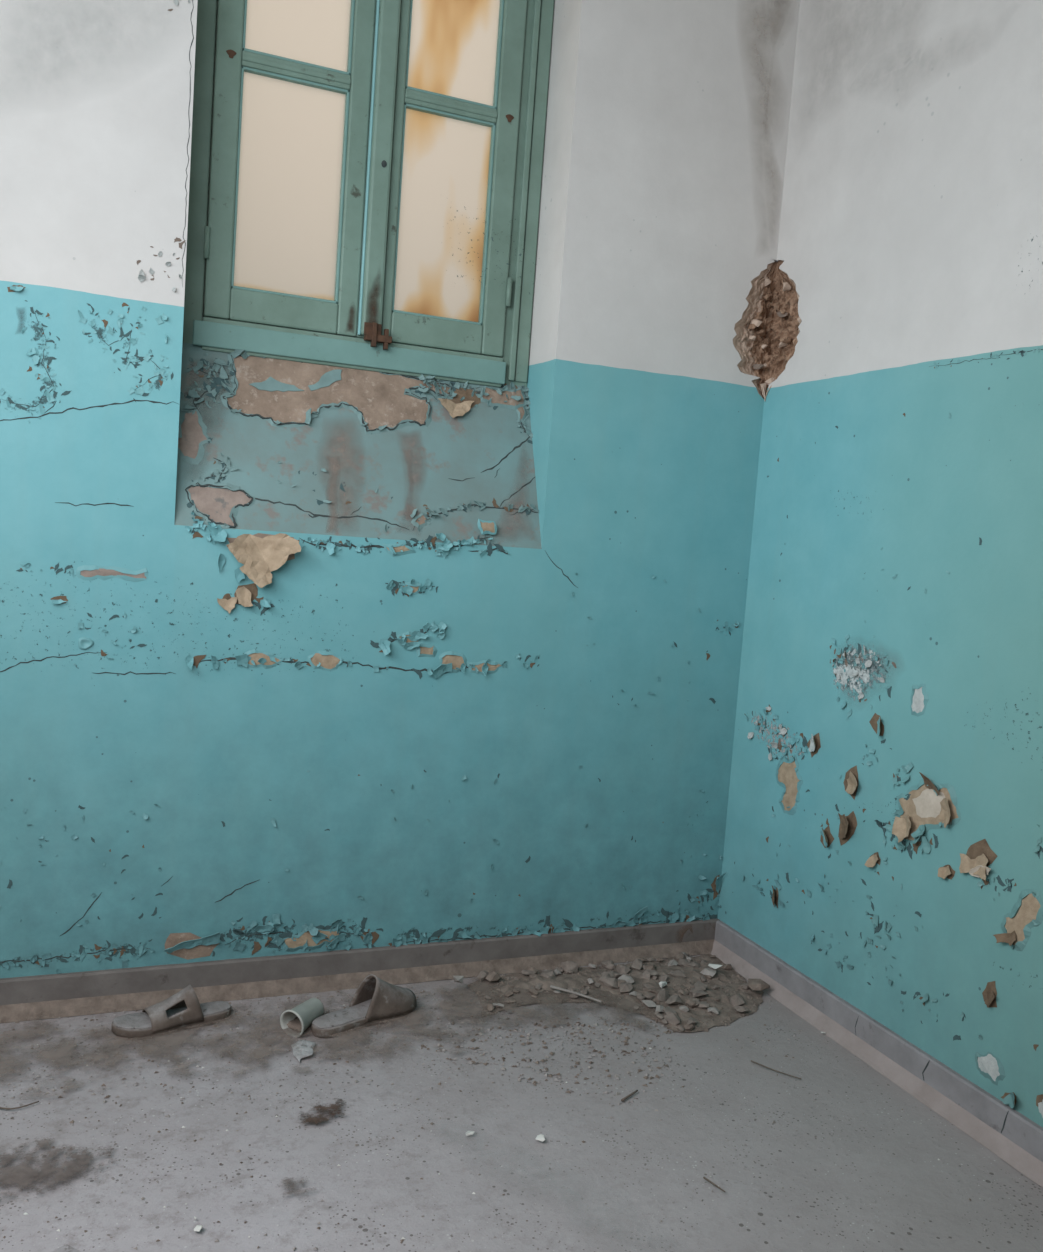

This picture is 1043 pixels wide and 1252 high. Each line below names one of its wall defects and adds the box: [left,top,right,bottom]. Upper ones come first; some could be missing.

peeling [0,285,70,423]
crack [0,400,178,421]
peeling [7,302,539,674]
crack [255,498,409,530]
crack [448,436,538,515]
crack [0,649,507,679]
peeling [744,705,821,817]
peeling [811,634,961,1023]
peeling [0,853,842,974]
peeling [938,839,1043,951]
peeling [982,981,997,1007]
peeling [975,1035,1017,1109]